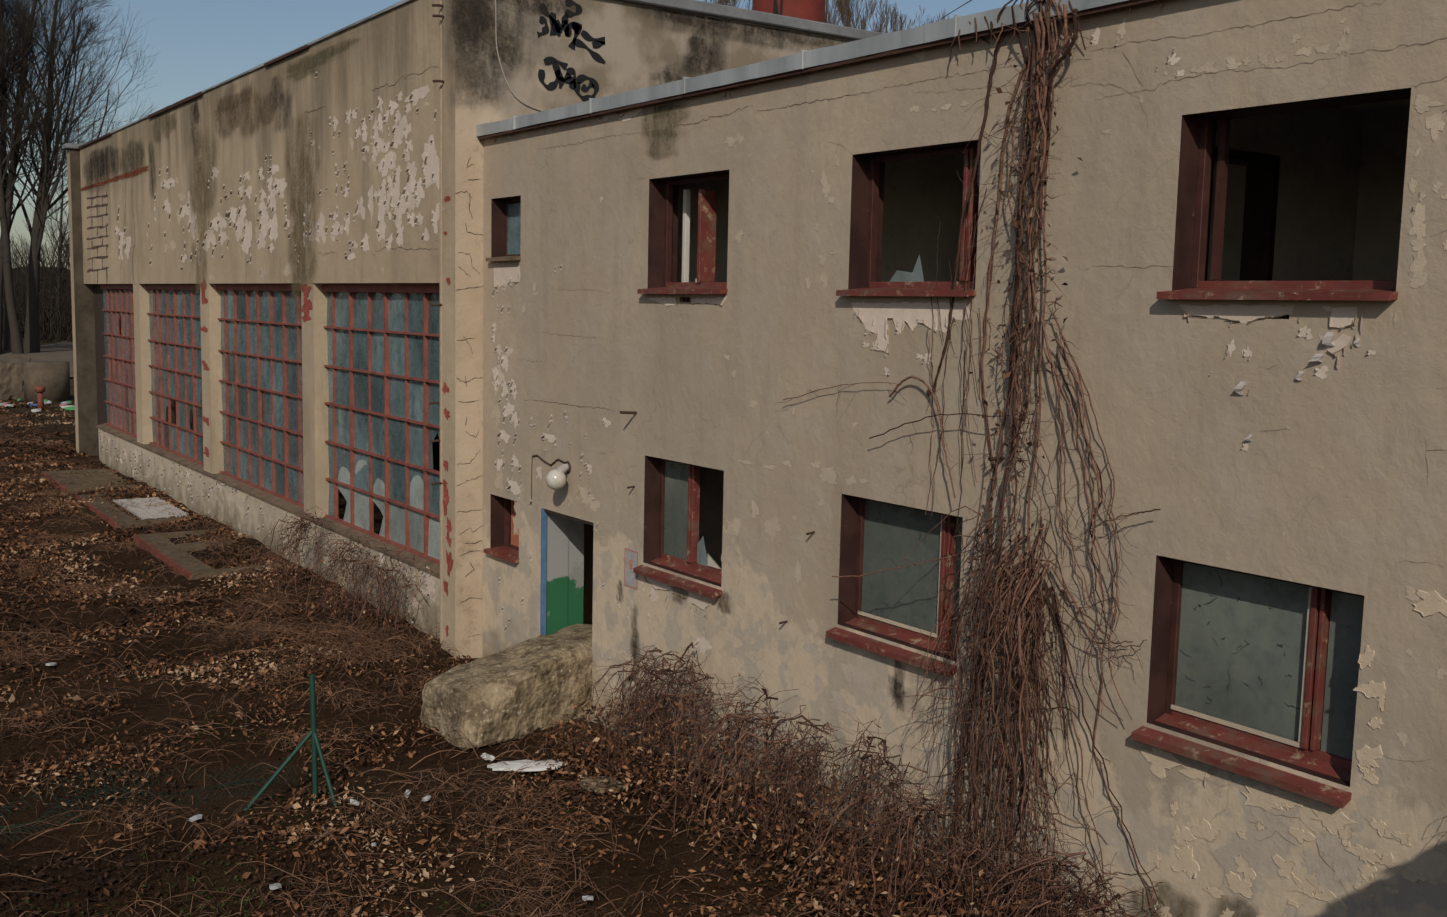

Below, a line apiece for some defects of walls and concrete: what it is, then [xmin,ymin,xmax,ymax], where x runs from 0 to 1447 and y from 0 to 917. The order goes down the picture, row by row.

water stain [191,40,349,217]
crack [1075,0,1447,126]
peeling [87,85,451,322]
peeling [1408,177,1447,289]
peeling [851,302,971,376]
peeling [1179,304,1376,381]
peeling [491,266,629,619]
peeling [642,500,797,663]
peeling [1405,586,1447,617]
peeling [1139,746,1211,786]
peeling [1353,645,1408,785]
peeling [1154,784,1426,917]